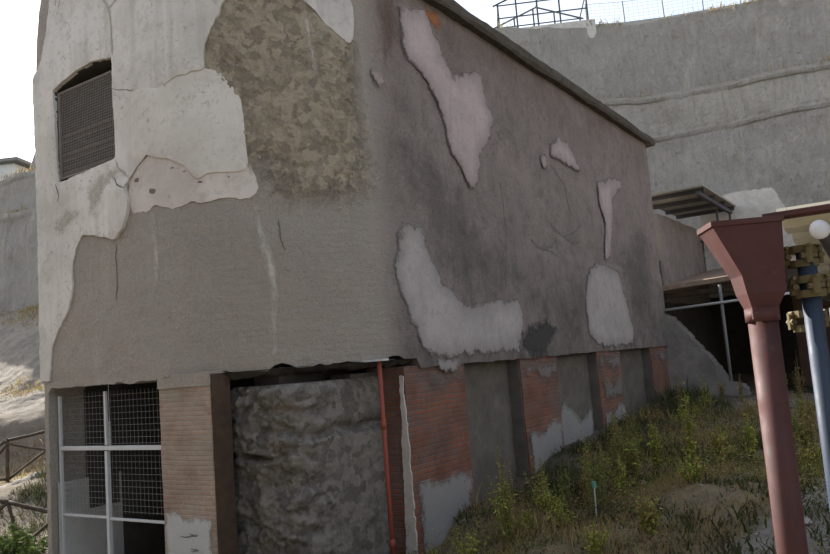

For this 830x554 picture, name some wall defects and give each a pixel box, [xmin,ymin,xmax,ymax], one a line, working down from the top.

crack [102,0,116,55]
crack [113,155,148,188]
flaking render [32,0,375,382]
flaking render [397,4,493,189]
flaking render [393,222,524,372]
flaking render [539,138,581,171]
flaking render [585,177,634,348]